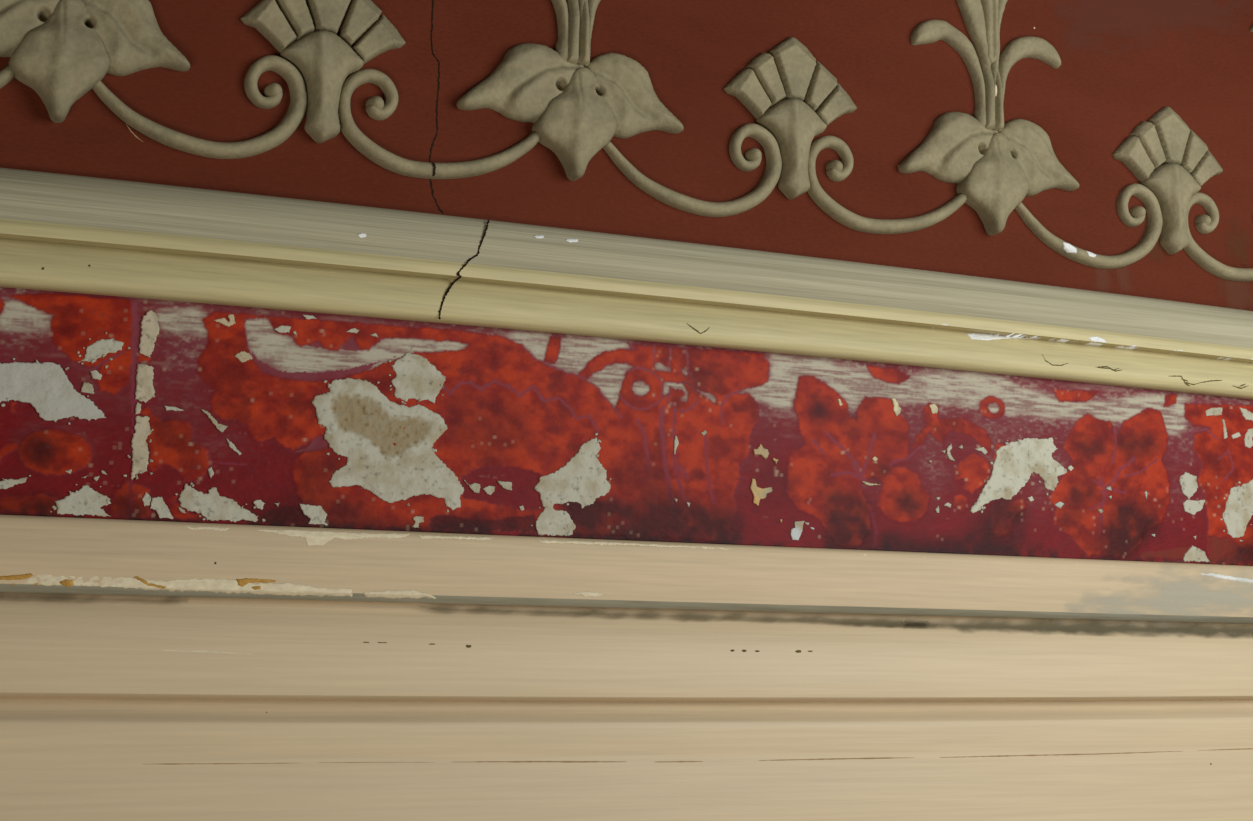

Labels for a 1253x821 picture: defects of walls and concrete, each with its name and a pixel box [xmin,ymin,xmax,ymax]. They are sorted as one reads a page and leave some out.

crack [429,0,444,214]
crack [438,220,490,319]
peeling [50,469,111,517]
peeling [0,310,184,480]
peeling [142,348,512,546]
peeling [531,433,732,550]
peeling [779,519,814,540]
peeling [929,435,1074,513]
peeling [1179,472,1205,515]
peeling [1205,407,1253,448]
peeling [1220,479,1253,542]
peeling [24,574,436,599]